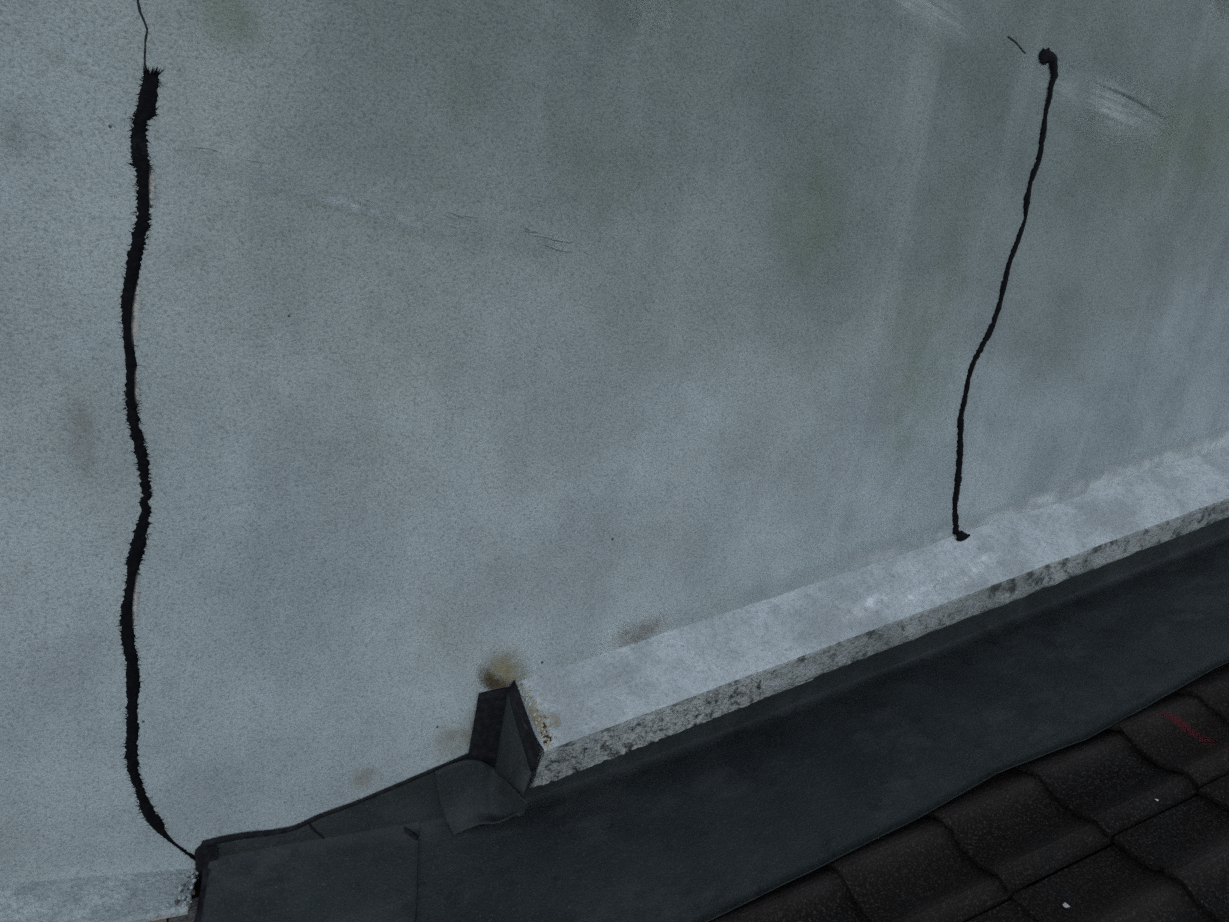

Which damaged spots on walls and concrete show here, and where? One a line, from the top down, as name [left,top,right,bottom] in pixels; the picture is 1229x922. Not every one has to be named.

crack [119,0,195,861]
corrosion [484,659,517,690]
crack [952,36,1059,542]